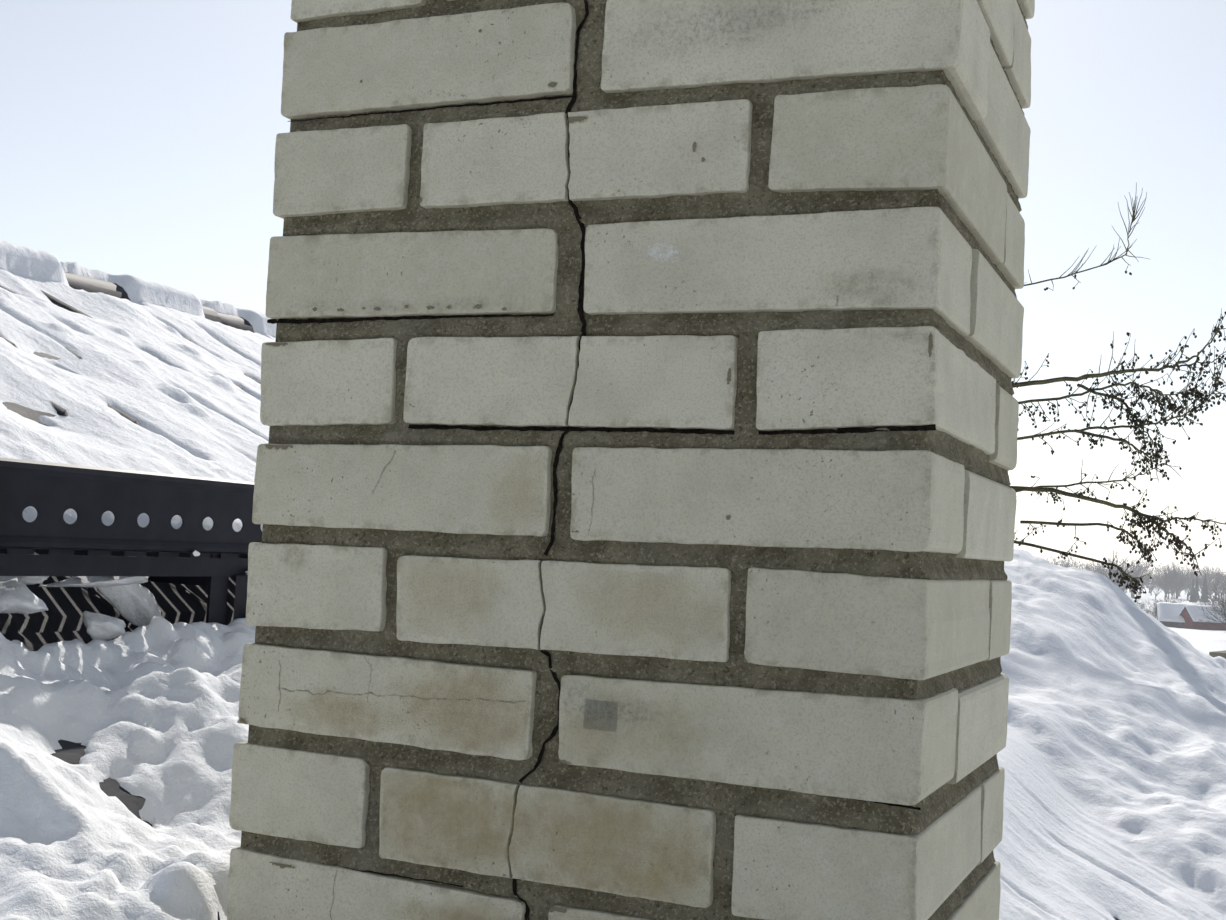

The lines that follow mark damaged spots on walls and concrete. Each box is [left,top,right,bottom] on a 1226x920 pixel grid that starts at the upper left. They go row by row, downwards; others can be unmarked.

crack [267,0,936,804]
crack [847,798,921,810]
crack [345,867,463,887]
crack [512,879,530,920]